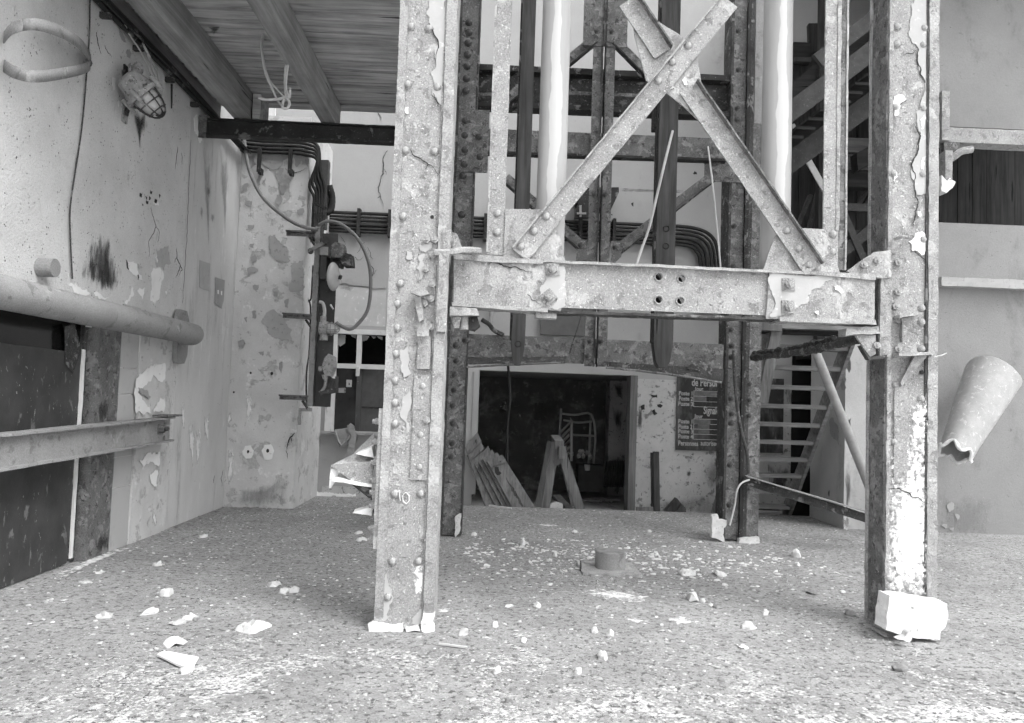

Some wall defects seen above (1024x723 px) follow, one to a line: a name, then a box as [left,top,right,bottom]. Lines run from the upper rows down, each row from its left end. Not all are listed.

peeling [893,94,906,116]
peeling [908,0,929,195]
peeling [242,149,308,207]
crack [378,150,438,203]
peeling [406,242,432,280]
peeling [244,235,305,340]
peeling [768,273,844,317]
peeling [134,363,166,415]
peeling [140,452,160,487]